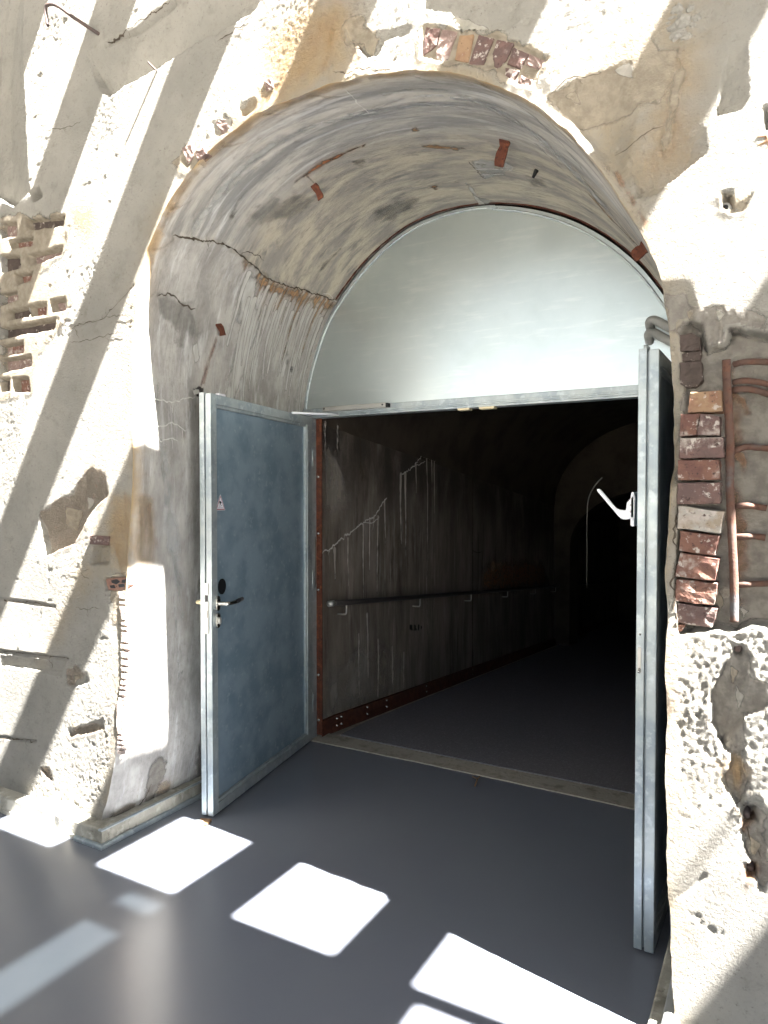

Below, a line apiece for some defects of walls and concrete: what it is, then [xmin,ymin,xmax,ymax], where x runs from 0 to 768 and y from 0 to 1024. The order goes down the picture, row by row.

spalling [416,14,561,92]
spalling [0,212,72,400]
crack [173,234,337,302]
rust [255,273,333,360]
spalling [664,294,768,629]
spalling [40,462,108,554]
rust [726,494,746,577]
spalling [705,648,768,887]